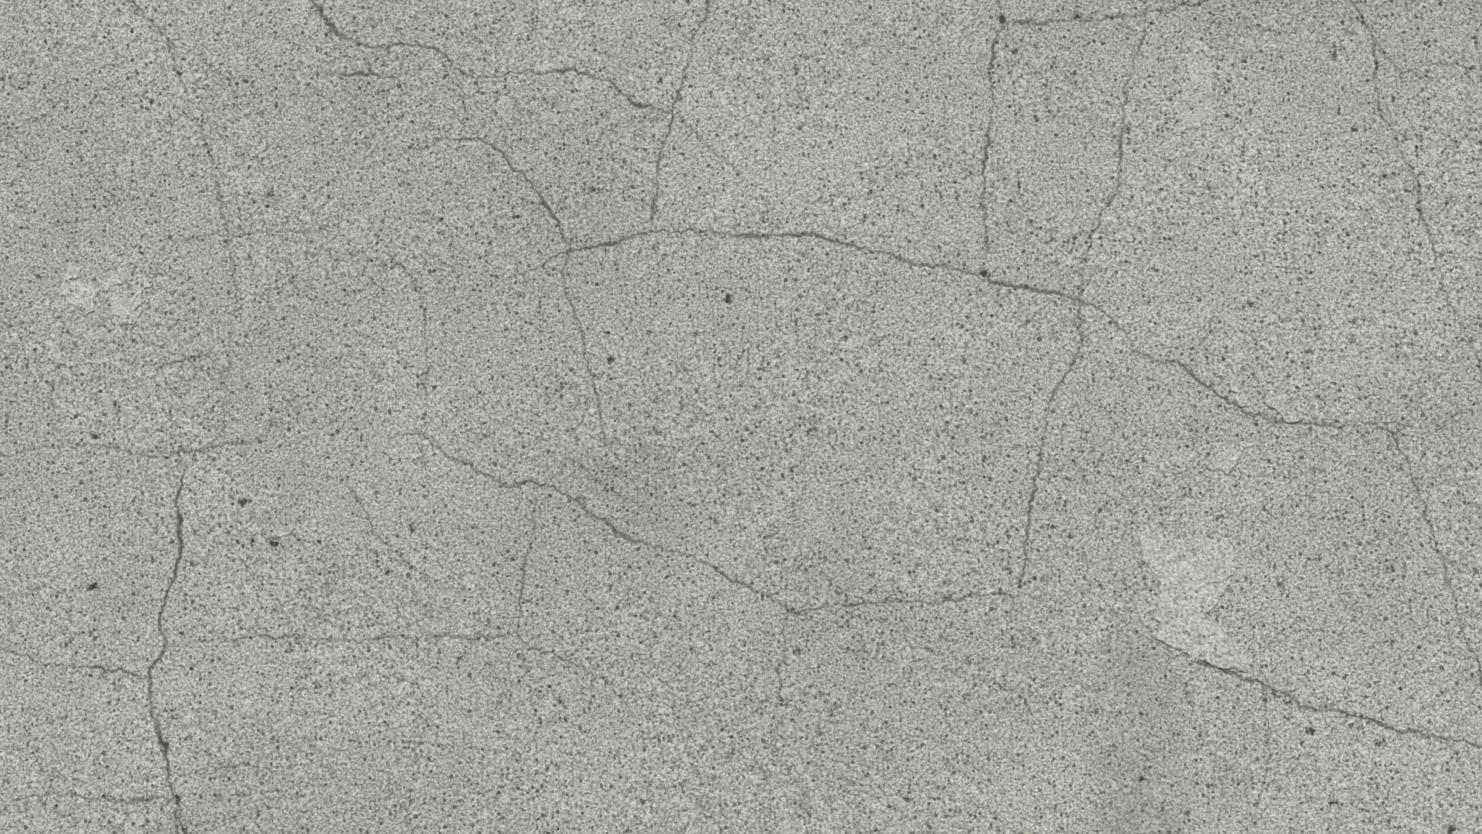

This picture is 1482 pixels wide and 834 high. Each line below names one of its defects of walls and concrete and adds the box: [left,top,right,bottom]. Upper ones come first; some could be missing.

crack [313,2,336,32]
crack [349,42,589,77]
crack [632,99,678,165]
crack [981,127,990,180]
crack [456,138,693,266]
crack [741,233,862,249]
crack [981,273,1059,294]
crack [1172,360,1253,416]
crack [1022,472,1039,576]
flaking render [1137,530,1250,673]
crack [81,477,187,834]
crack [1312,708,1416,733]